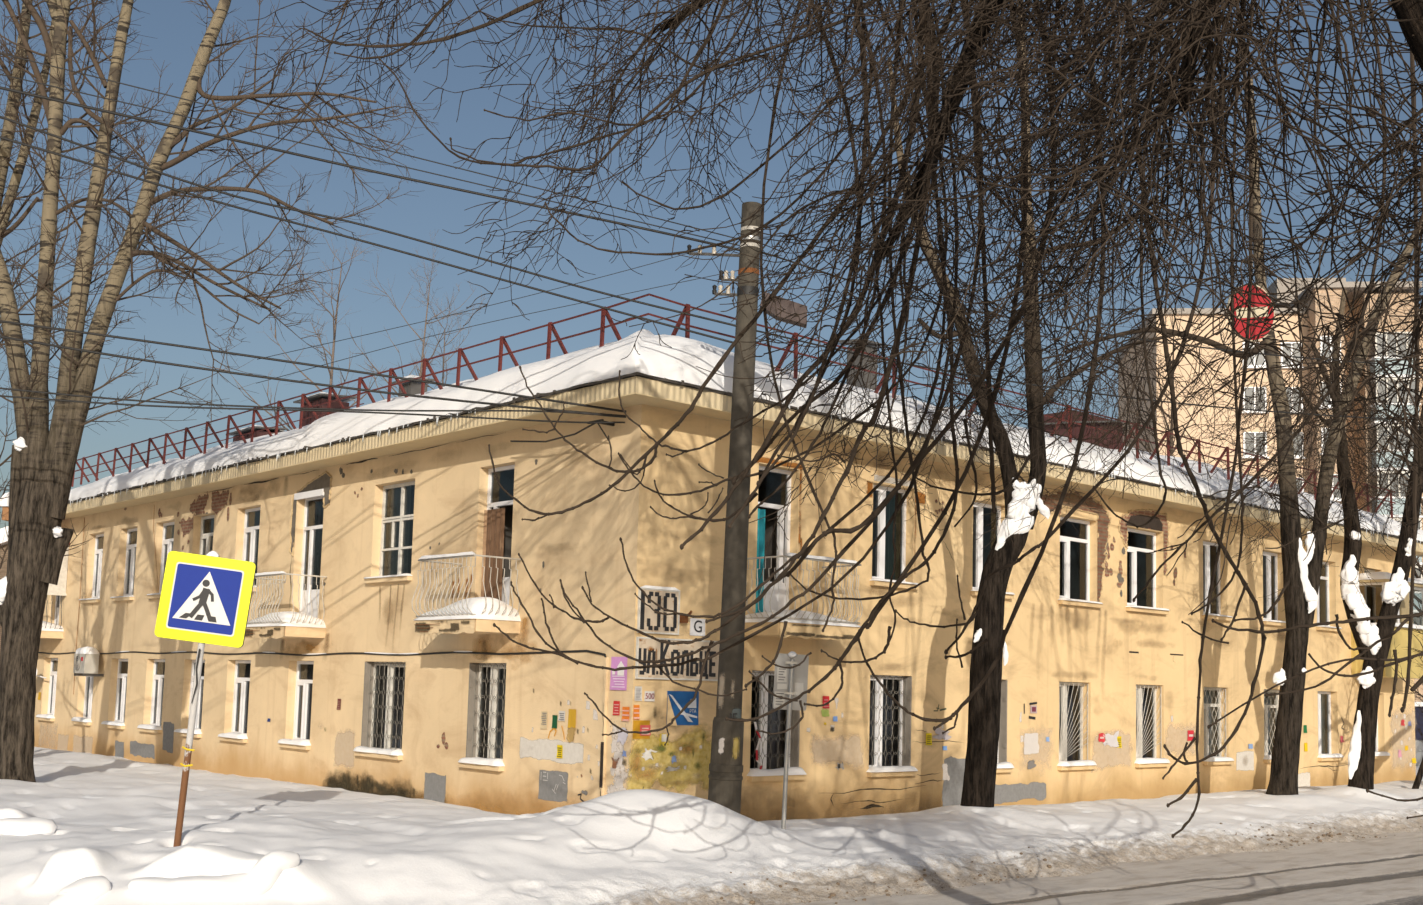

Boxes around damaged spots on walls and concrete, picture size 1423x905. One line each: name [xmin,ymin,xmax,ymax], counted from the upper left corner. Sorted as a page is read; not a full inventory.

flaking render [158,490,232,551]